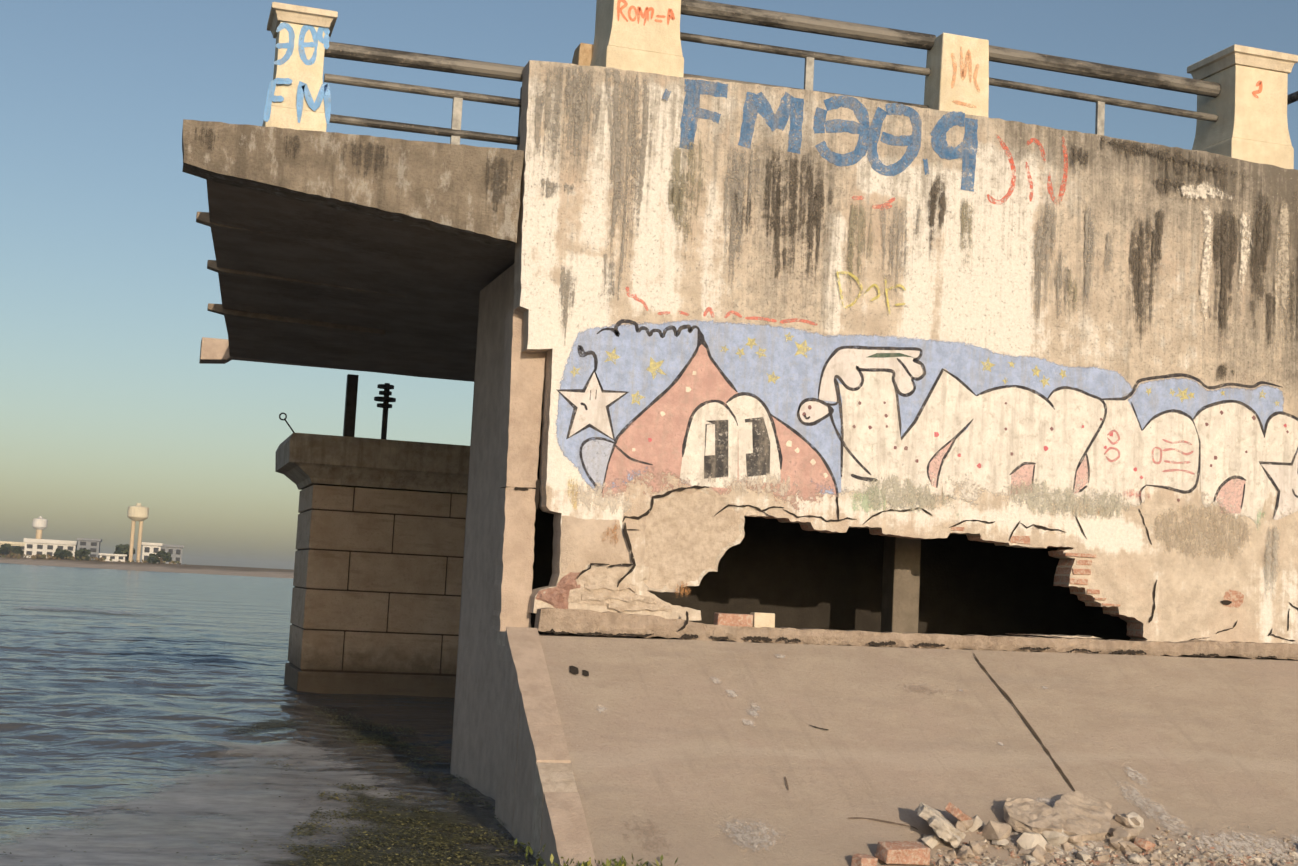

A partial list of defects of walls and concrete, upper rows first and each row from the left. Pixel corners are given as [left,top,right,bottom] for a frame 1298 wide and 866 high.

damp [534,66,652,301]
damp [724,149,833,280]
damp [845,175,973,292]
damp [1071,137,1298,349]
flaking render [535,492,769,612]
crack [546,611,801,643]
flaking render [1010,536,1030,545]
flaking render [1051,553,1120,607]
crack [1019,580,1157,655]
crack [1190,620,1238,657]
flaking render [1221,589,1244,608]
crack [868,640,1075,792]